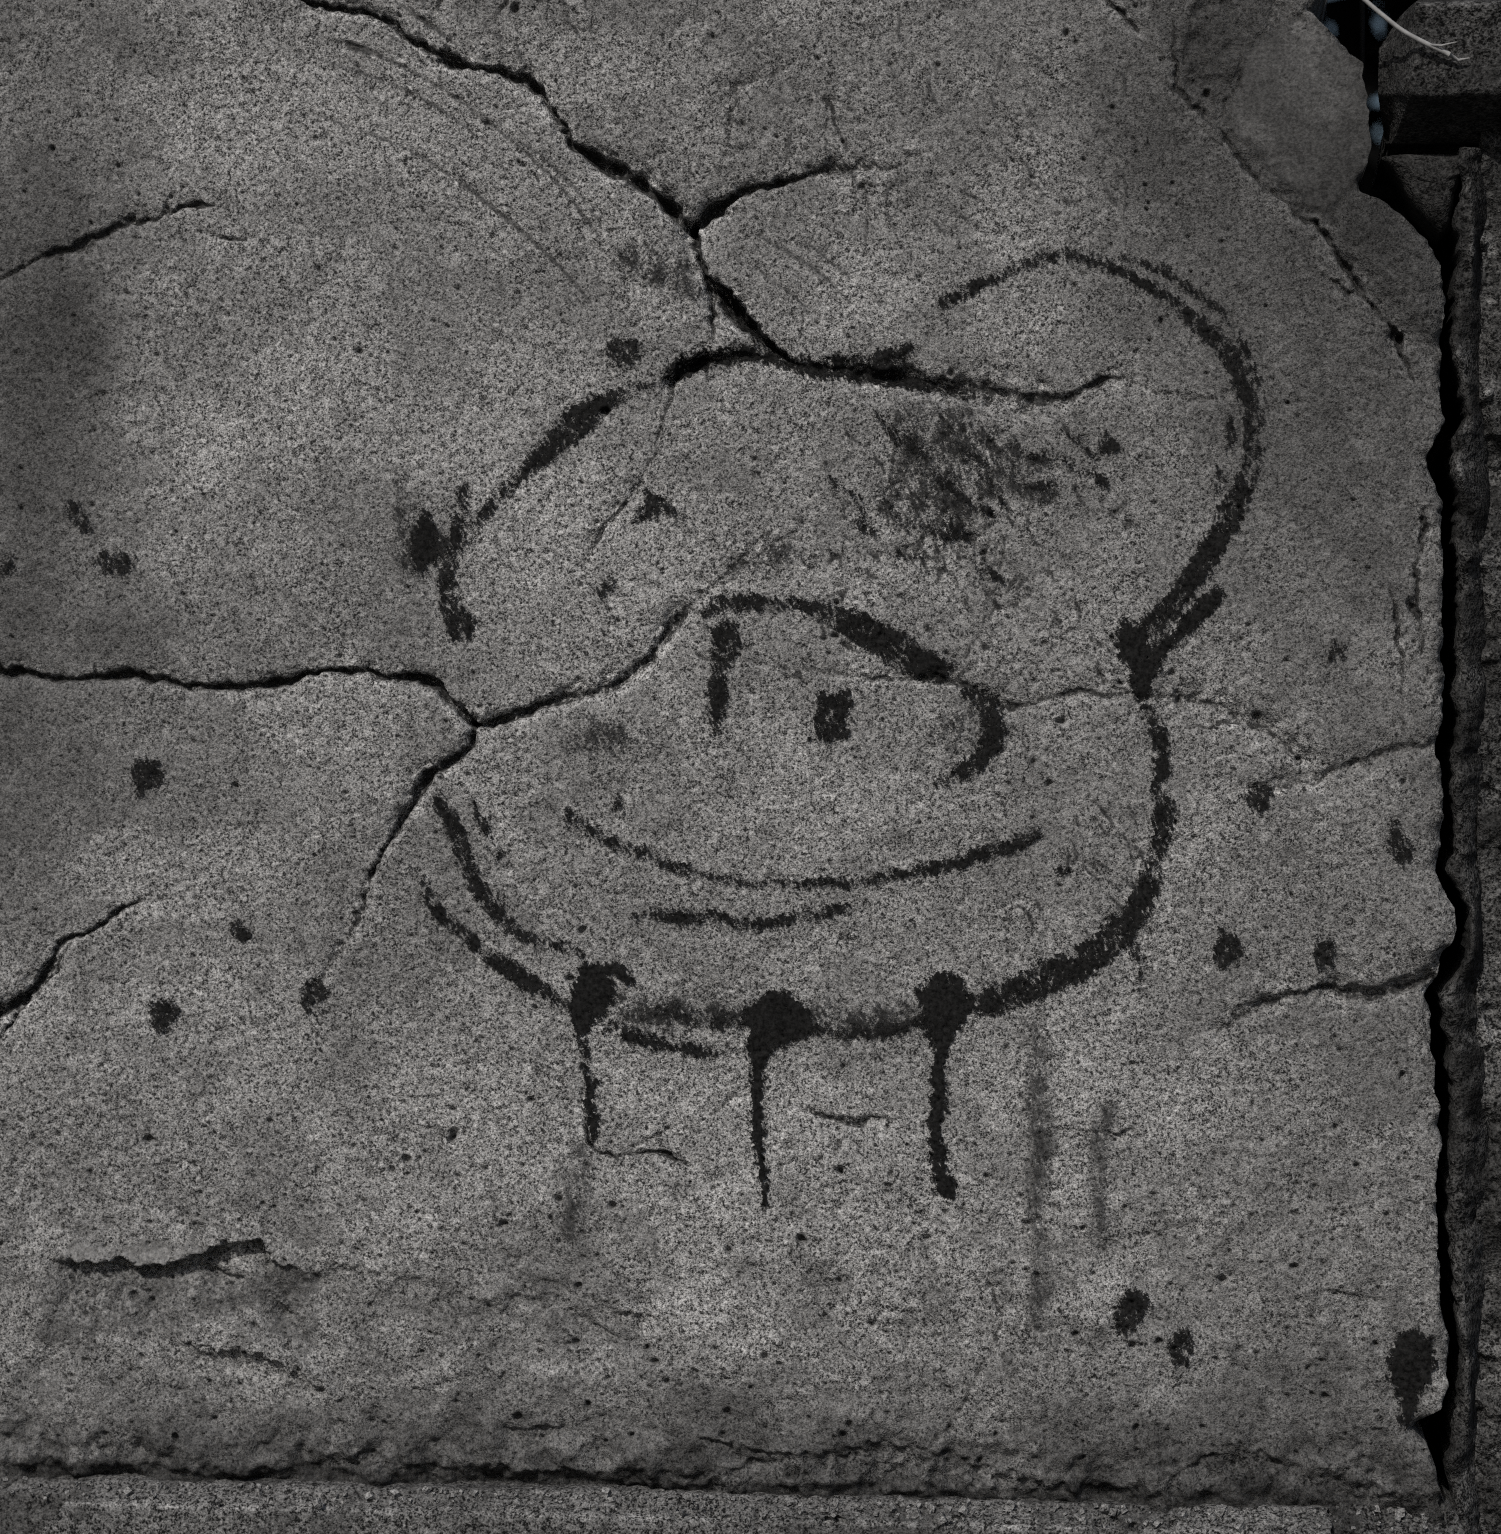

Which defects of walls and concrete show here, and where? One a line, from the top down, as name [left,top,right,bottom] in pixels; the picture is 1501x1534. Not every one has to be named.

crack [0,0,1432,984]
crack [1216,973,1437,1033]
flaking render [42,1235,307,1337]